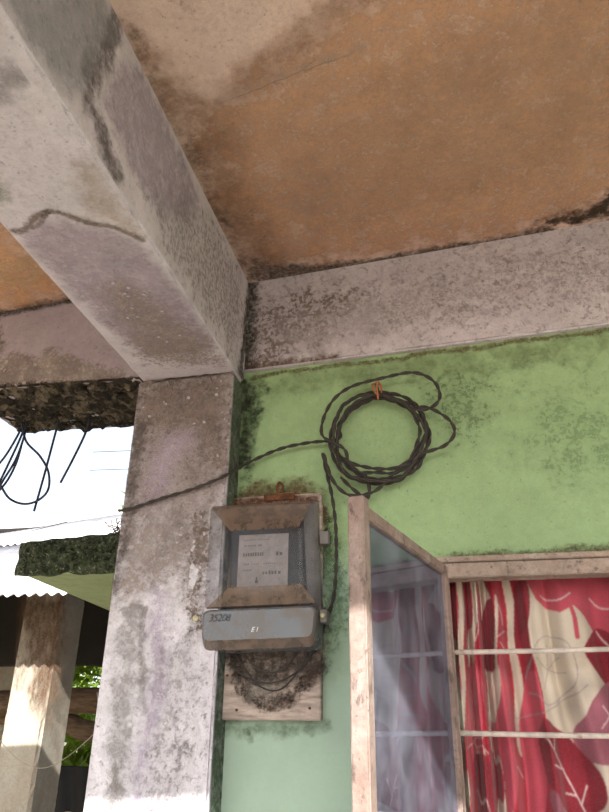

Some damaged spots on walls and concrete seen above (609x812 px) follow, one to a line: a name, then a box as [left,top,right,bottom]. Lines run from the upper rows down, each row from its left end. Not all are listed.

leakage [12,0,122,180]
leakage [112,0,609,281]
spalling [0,347,151,512]
leakage [227,375,269,506]
leakage [209,532,352,812]